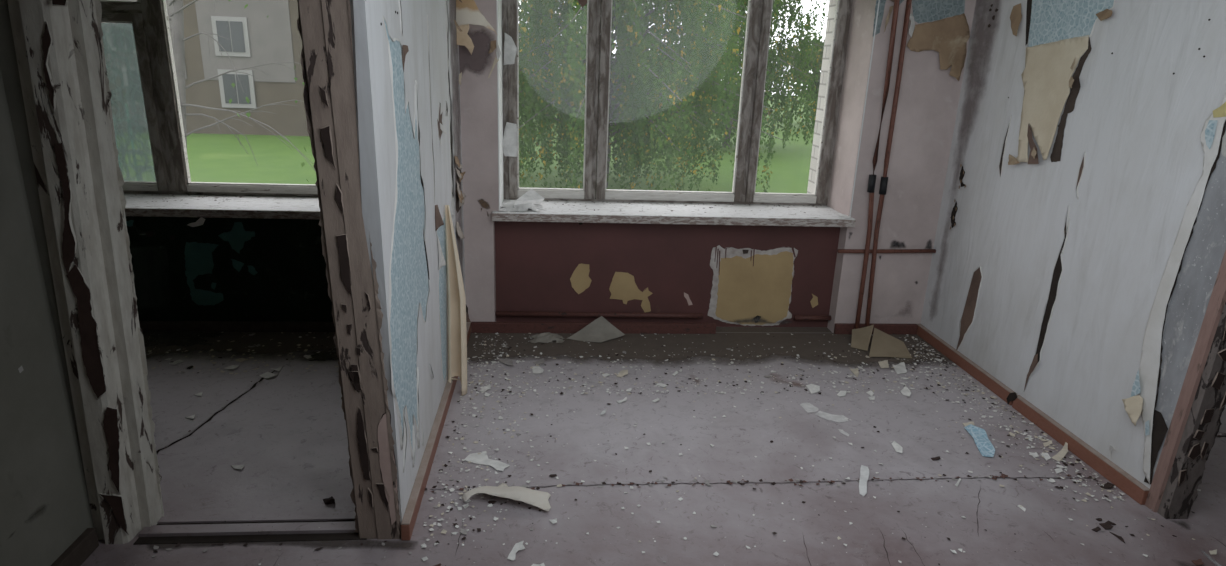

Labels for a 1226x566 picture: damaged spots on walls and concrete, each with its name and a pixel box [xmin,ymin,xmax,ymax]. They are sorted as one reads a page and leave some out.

peeling [42,21,56,114]
peeling [53,142,129,535]
peeling [184,222,258,306]
peeling [569,263,592,295]
peeling [609,271,653,313]
peeling [707,243,798,326]
flaking render [1152,129,1226,486]
crack [156,365,283,454]
crack [425,472,1100,536]